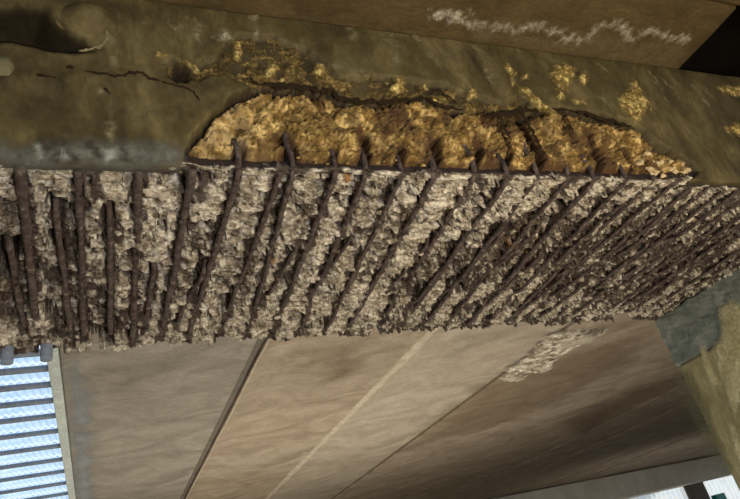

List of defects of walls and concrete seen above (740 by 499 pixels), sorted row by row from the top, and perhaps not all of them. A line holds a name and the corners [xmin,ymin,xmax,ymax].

efflorescence [433,10,484,29]
crack [36,65,200,101]
corrosion [0,198,41,302]
corrosion [177,219,216,299]
corrosion [226,255,256,301]
corrosion [253,190,277,226]
spalling [0,33,740,382]
corrosion [371,207,411,264]
corrosion [404,205,734,309]
corrosion [89,287,123,340]